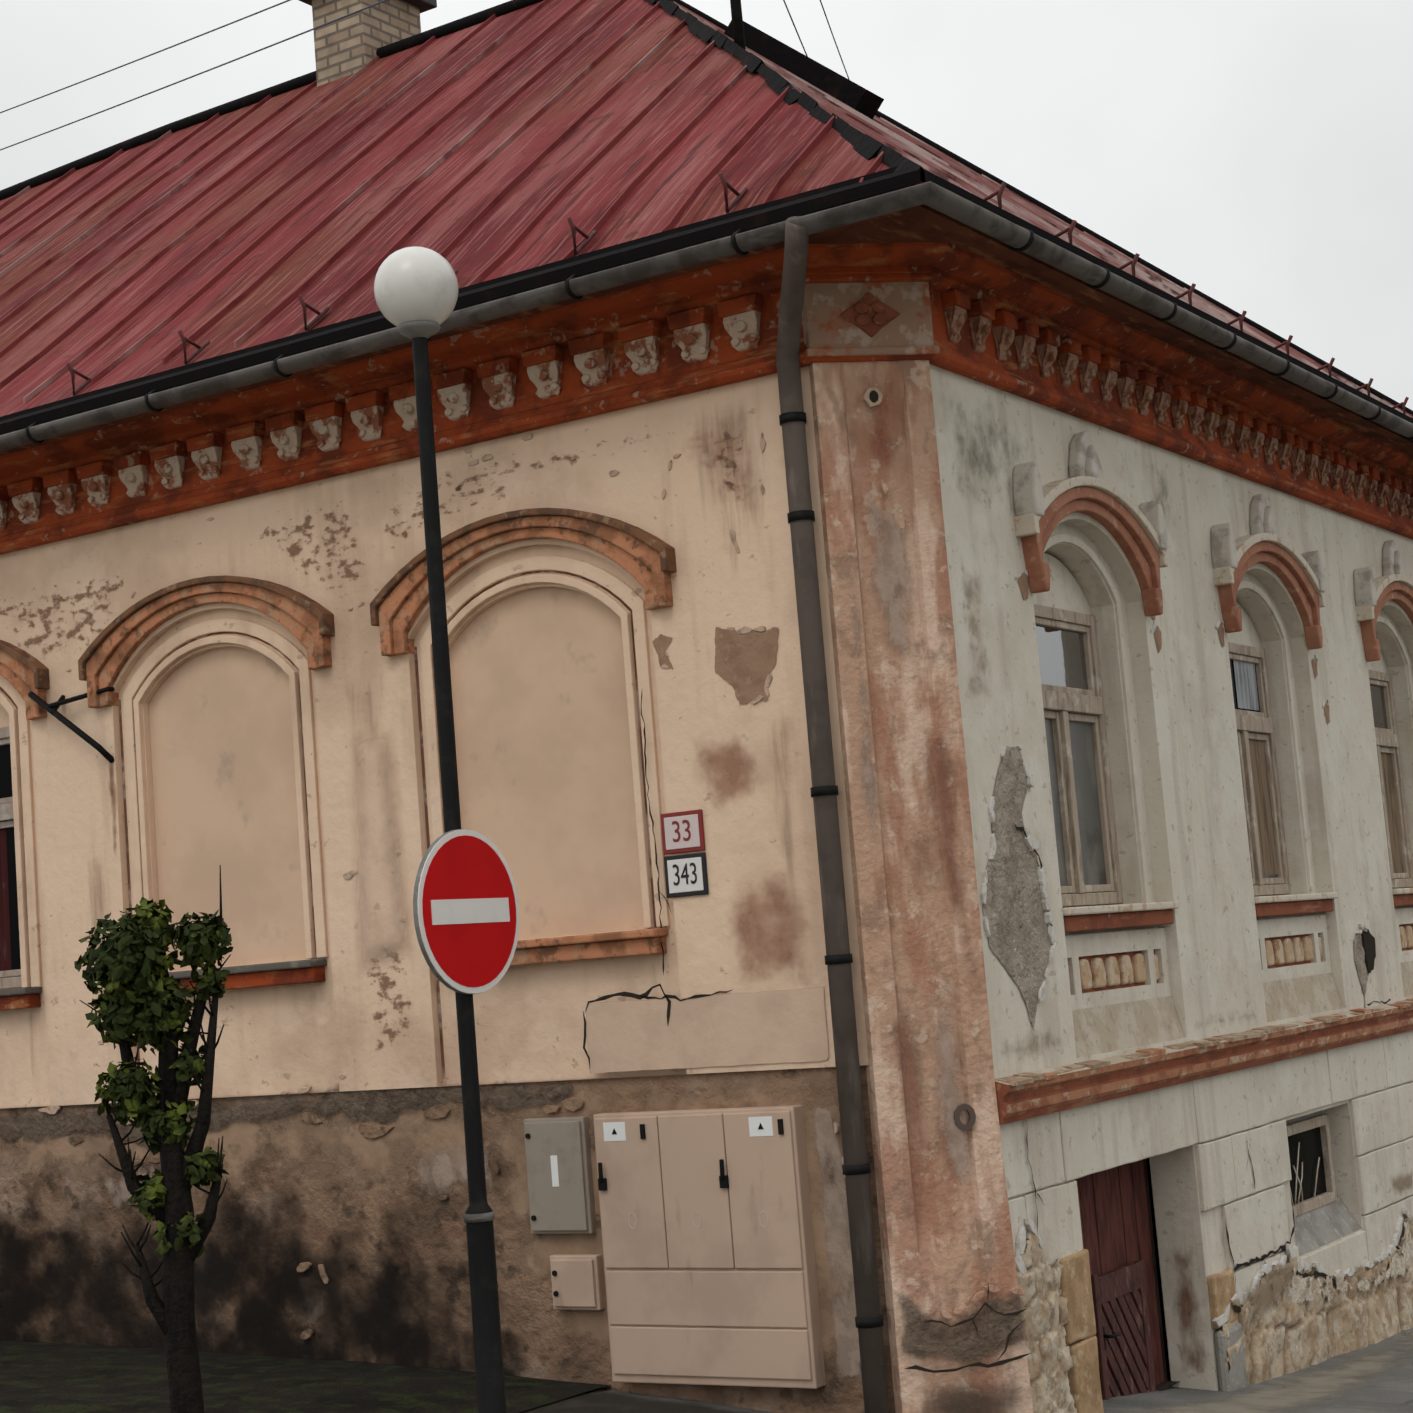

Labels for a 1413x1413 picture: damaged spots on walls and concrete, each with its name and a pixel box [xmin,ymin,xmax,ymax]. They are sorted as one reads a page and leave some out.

peeling [714,626,779,705]
water stain [707,747,748,793]
crack [583,692,732,1066]
water stain [738,889,792,962]
spalling [980,745,1057,1030]
spalling [1354,923,1376,998]
water stain [0,1222,165,1348]
water stain [194,1217,476,1373]
crack [905,1285,1031,1373]
spalling [900,1218,1077,1413]
spalling [1212,1207,1413,1385]
water stain [931,1387,1014,1413]